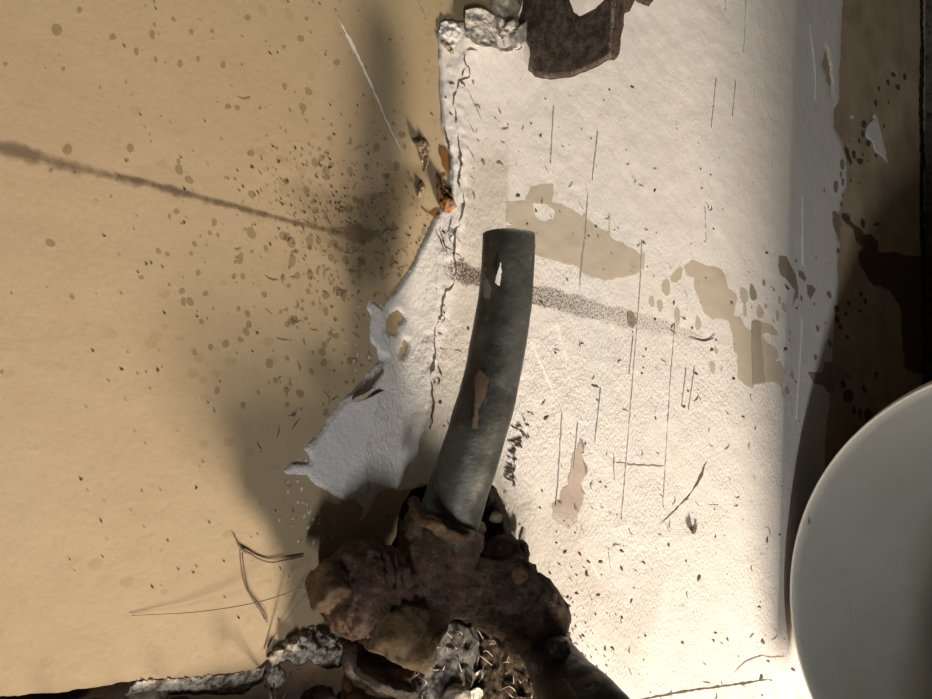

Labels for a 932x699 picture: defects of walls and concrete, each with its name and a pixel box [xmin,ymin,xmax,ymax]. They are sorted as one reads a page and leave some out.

peeling [439,8,527,53]
rust [440,146,450,176]
water stain [105,174,323,230]
crack [430,48,476,429]
water stain [506,184,645,280]
water stain [627,311,636,328]
water stain [649,256,816,395]
water stain [832,202,932,381]
flaking render [287,388,385,545]
peeling [552,439,588,513]
spalling [0,626,360,699]
flaking render [470,669,487,699]